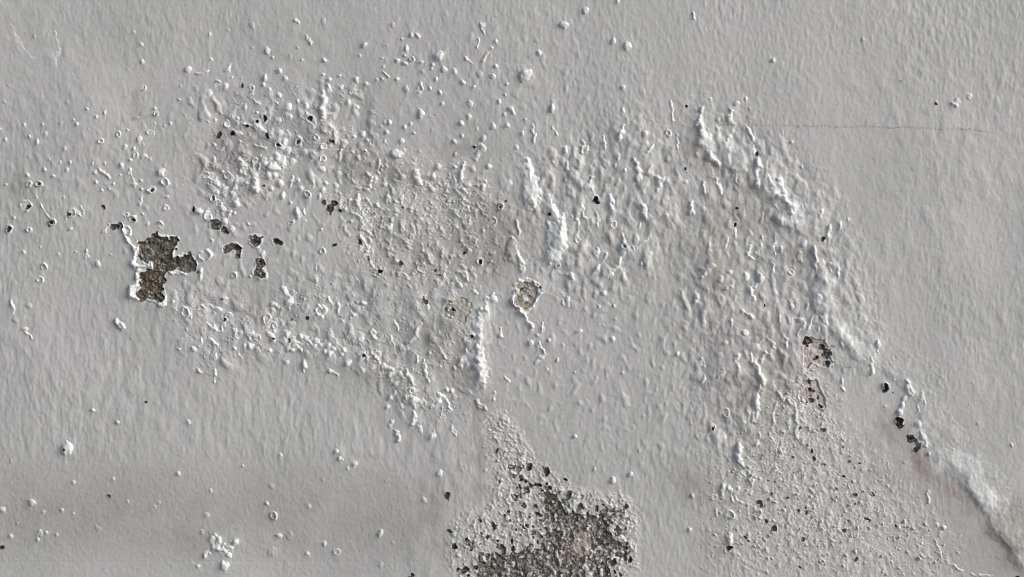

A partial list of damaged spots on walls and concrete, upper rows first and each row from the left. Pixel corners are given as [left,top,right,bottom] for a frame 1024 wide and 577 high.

spalling [109,221,199,308]
spalling [221,233,268,281]
spalling [323,139,543,325]
peeling [655,78,973,577]
spalling [443,408,644,577]